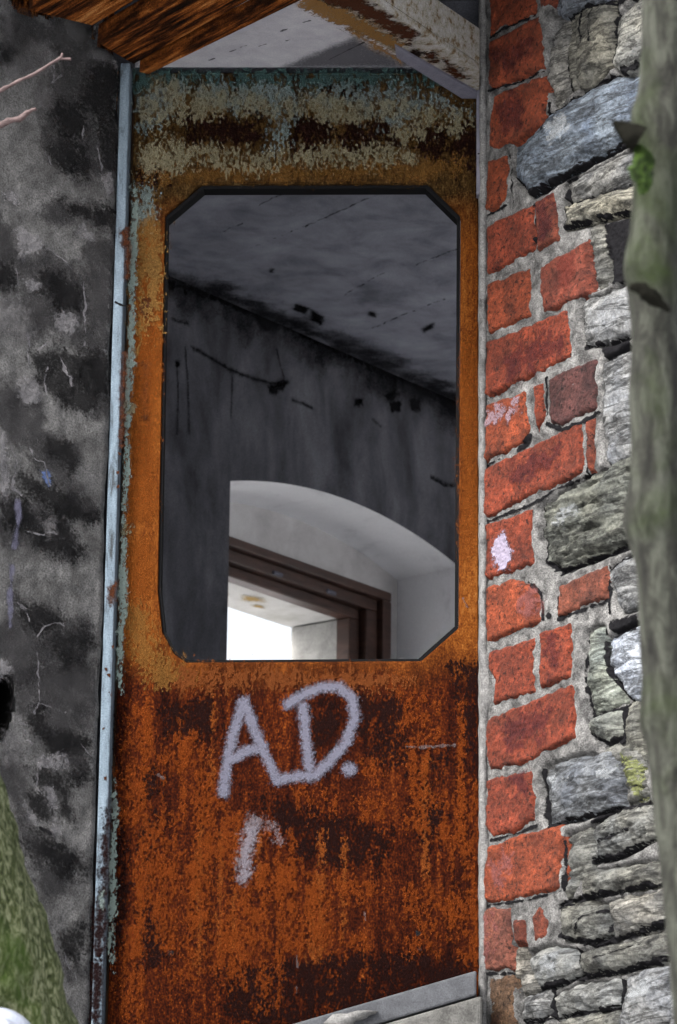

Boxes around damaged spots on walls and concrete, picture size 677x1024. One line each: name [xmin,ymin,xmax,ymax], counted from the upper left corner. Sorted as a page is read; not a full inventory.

rust [117,351,128,448]
rust [119,227,131,280]
peeling [104,58,476,696]
rust [88,534,479,1024]